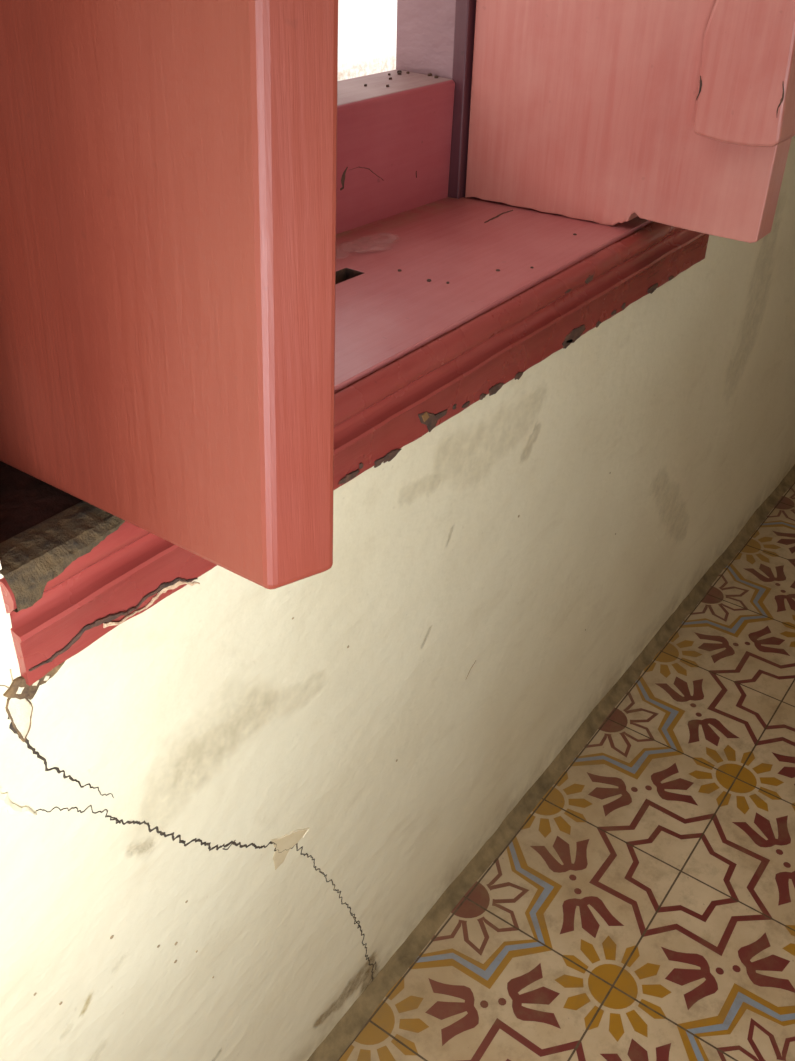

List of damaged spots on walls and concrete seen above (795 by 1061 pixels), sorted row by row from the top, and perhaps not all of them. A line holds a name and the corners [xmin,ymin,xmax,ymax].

crack [340,167,384,191]
peeling [562,321,601,349]
peeling [418,372,523,432]
peeling [338,449,401,485]
crack [0,578,200,688]
crack [8,716,376,982]
peeling [271,828,310,870]